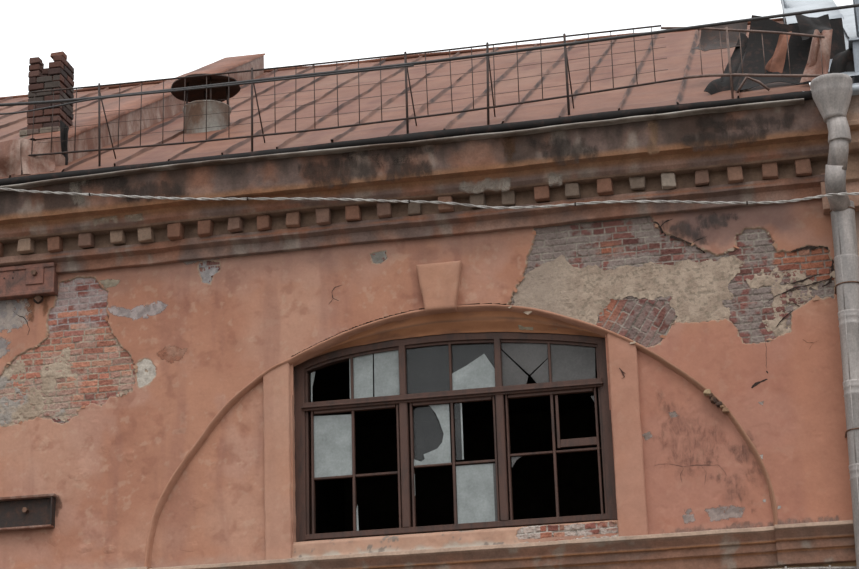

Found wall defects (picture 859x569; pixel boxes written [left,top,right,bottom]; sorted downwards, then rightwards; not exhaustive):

spalling [0,277,187,427]
spalling [508,216,835,347]
crack [653,219,705,253]
crack [751,245,835,388]
spalling [516,521,618,542]